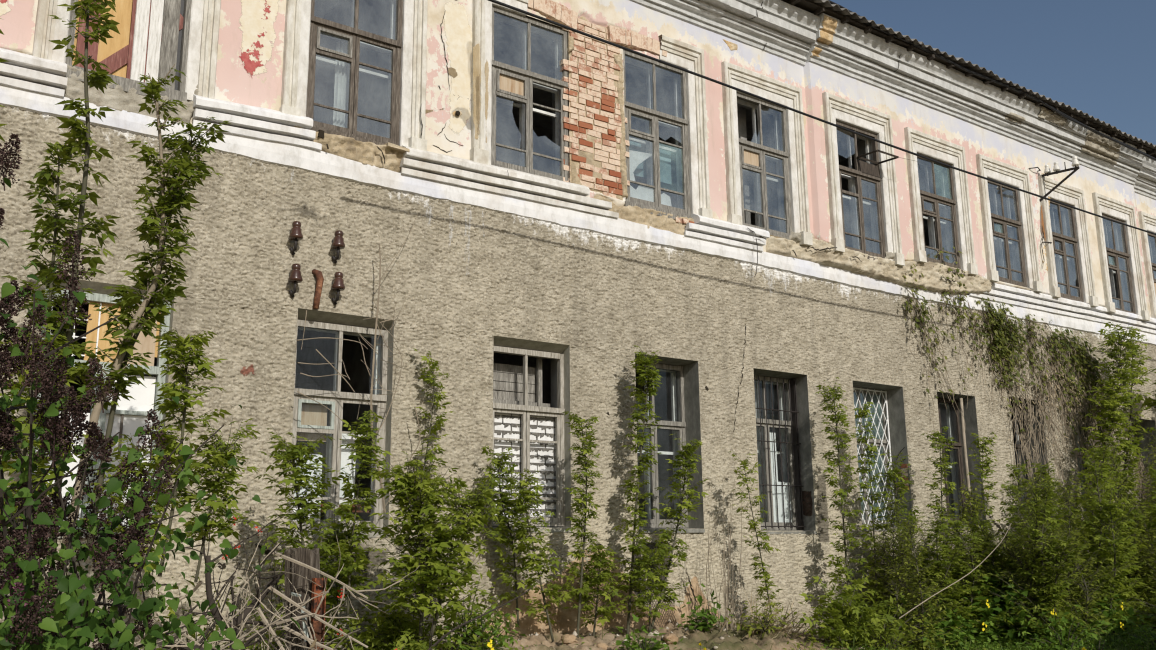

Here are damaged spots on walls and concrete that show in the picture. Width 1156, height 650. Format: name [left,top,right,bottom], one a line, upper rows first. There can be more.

peeling [239,0,279,77]
peeling [441,1,472,135]
flaking render [294,126,410,173]
crack [420,86,463,153]
flaking render [527,0,694,238]
flaking render [766,232,992,295]